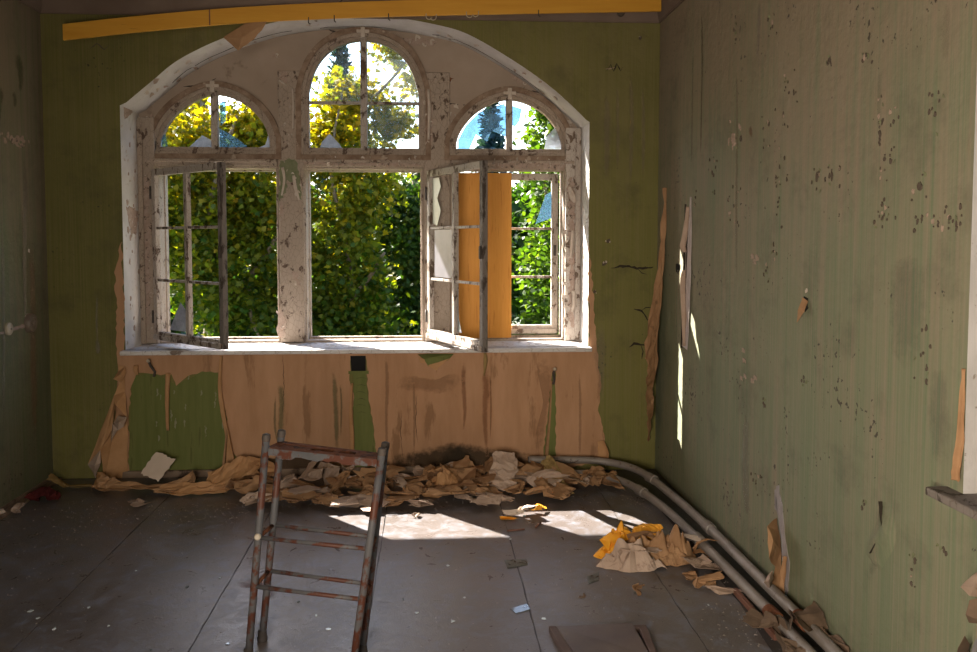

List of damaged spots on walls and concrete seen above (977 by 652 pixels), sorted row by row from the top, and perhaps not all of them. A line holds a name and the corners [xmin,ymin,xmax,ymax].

crack [615,265,653,274]
peeling [644,188,667,442]
peeling [676,190,696,350]
peeling [88,365,128,479]
peeling [156,373,186,441]
peeling [214,356,234,466]
spalling [348,356,369,450]
peeling [418,354,453,371]
flaking render [957,636,977,652]
peeling [961,572,977,623]